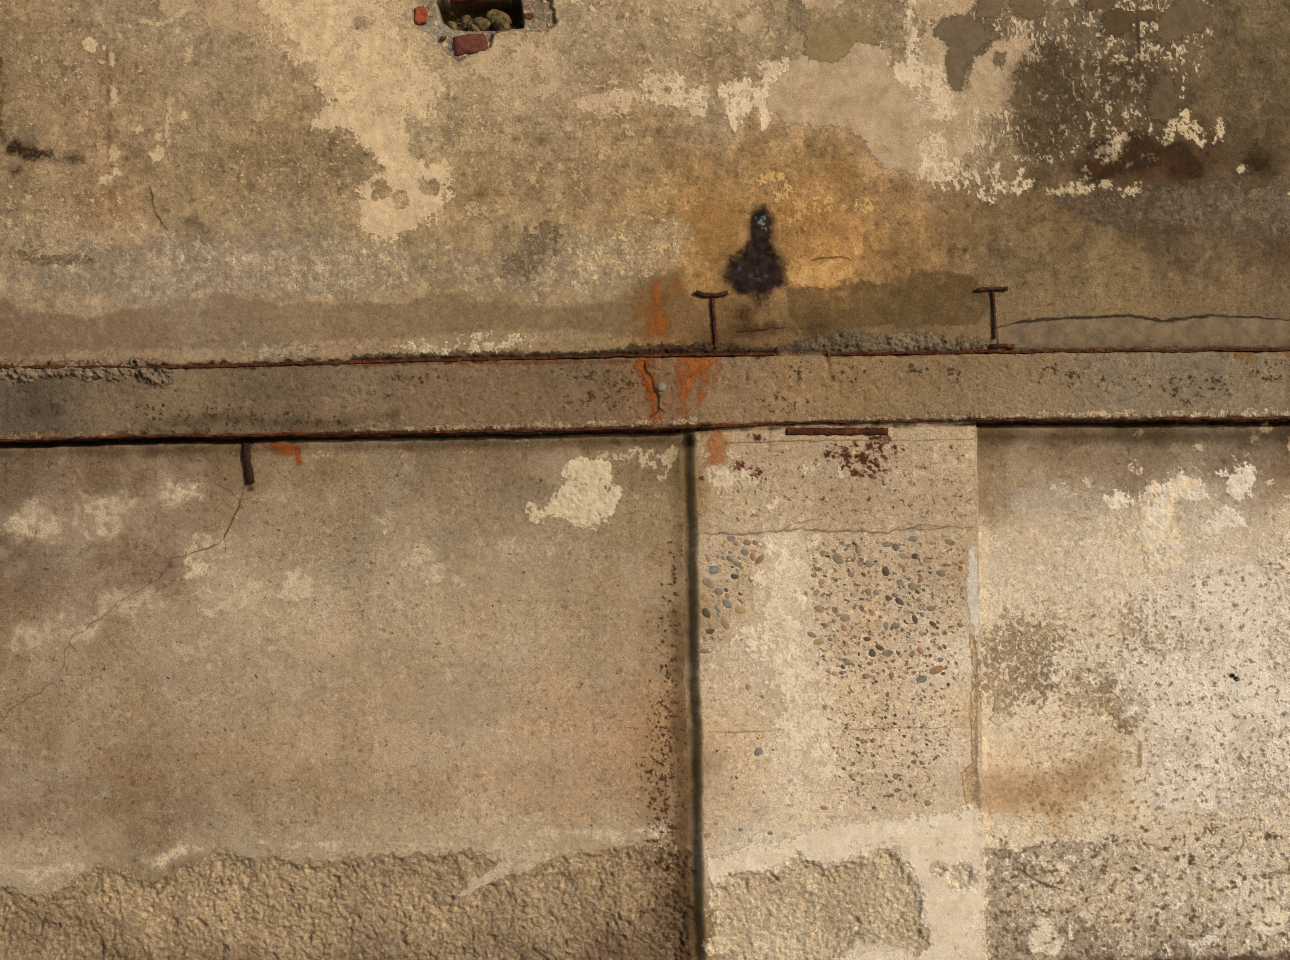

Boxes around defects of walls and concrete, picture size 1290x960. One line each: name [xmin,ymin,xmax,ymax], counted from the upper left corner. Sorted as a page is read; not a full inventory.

peeling [0,0,1290,307]
rust [148,347,1072,486]
rust [1092,414,1290,426]